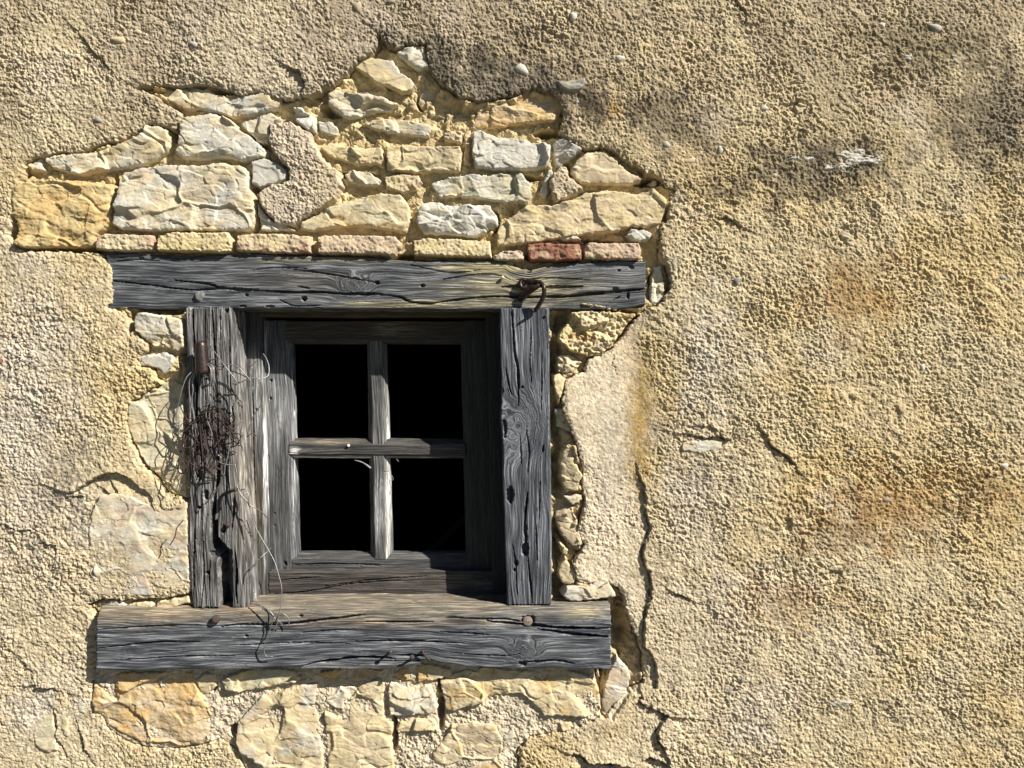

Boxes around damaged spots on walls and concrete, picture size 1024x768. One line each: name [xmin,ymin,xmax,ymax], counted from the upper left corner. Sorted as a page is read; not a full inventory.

spalling [12,38,674,768]
spalling [786,149,883,172]